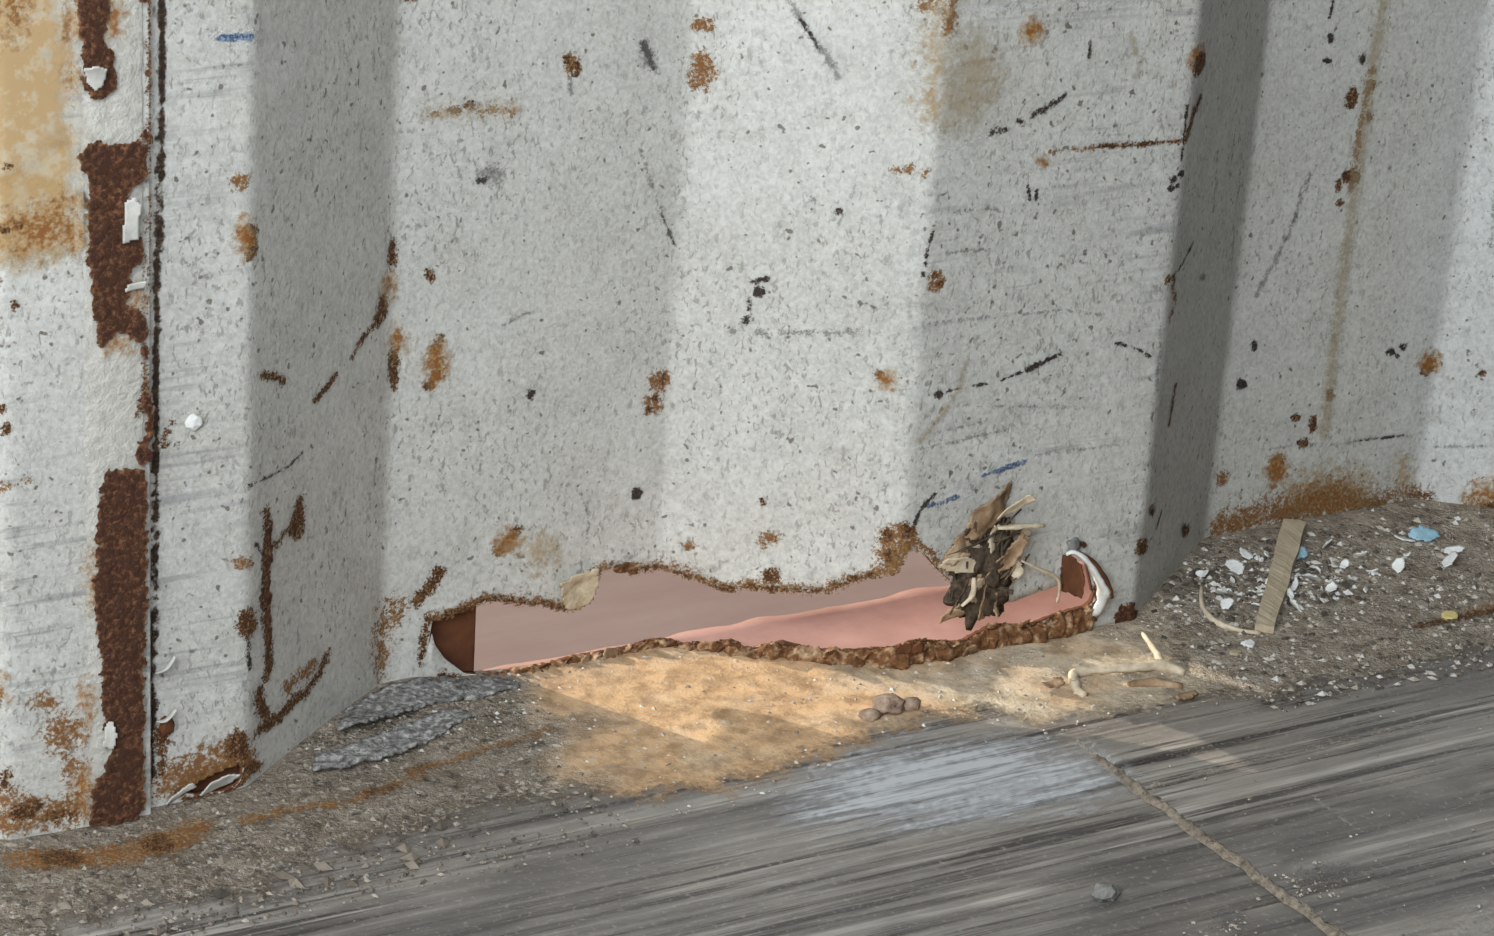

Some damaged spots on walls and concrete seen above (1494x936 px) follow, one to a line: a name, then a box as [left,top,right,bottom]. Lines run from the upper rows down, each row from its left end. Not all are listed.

corrosion [910,0,959,122]
corrosion [382,237,399,307]
corrosion [387,328,407,392]
corrosion [150,496,332,804]
corrosion [0,675,215,872]